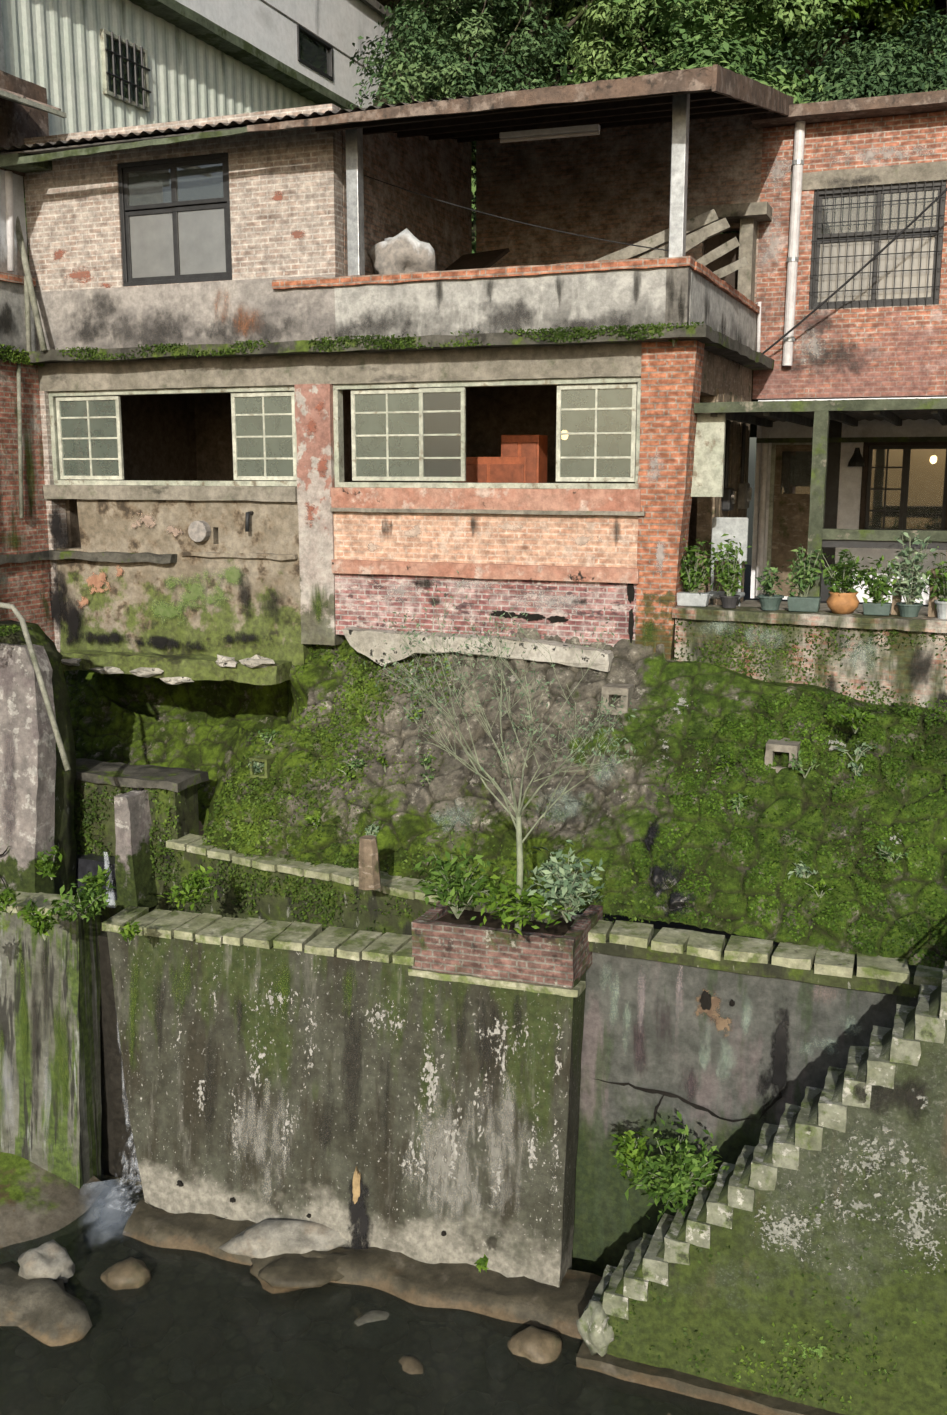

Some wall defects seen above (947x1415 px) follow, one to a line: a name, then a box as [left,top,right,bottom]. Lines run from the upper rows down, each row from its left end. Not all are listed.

water stain [47,509,204,650]
water stain [239,580,278,621]
water stain [224,632,272,642]
peeling [61,658,194,685]
peeling [215,655,275,668]
water stain [911,650,932,683]
water stain [20,955,68,1105]
water stain [319,974,360,1148]
water stain [758,1009,789,1115]
crack [596,1079,784,1122]
spalling [352,1166,361,1204]
water stain [342,1179,370,1249]